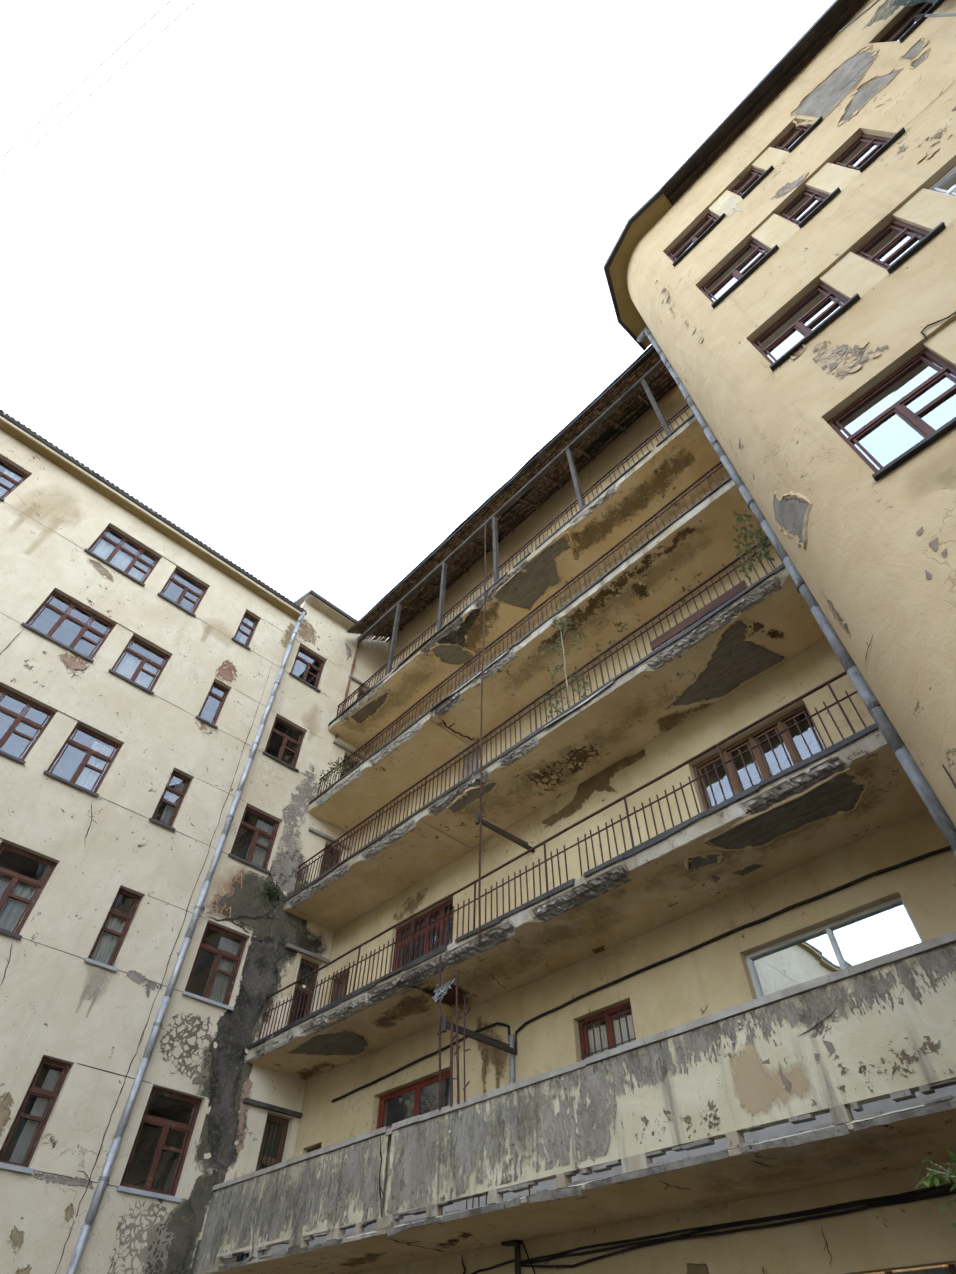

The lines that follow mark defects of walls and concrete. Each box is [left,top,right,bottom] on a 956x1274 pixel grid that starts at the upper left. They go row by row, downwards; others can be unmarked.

flaking render [790,37,931,127]
water stain [568,449,693,560]
peeling [279,618,317,648]
flaking render [421,485,618,688]
flaking render [647,576,790,710]
peeling [270,722,424,908]
peeling [528,743,646,826]
flaking render [684,757,870,883]
water stain [144,850,383,1274]
flaking render [159,924,514,1170]
peeling [193,943,956,1274]
peeling [107,1197,175,1274]